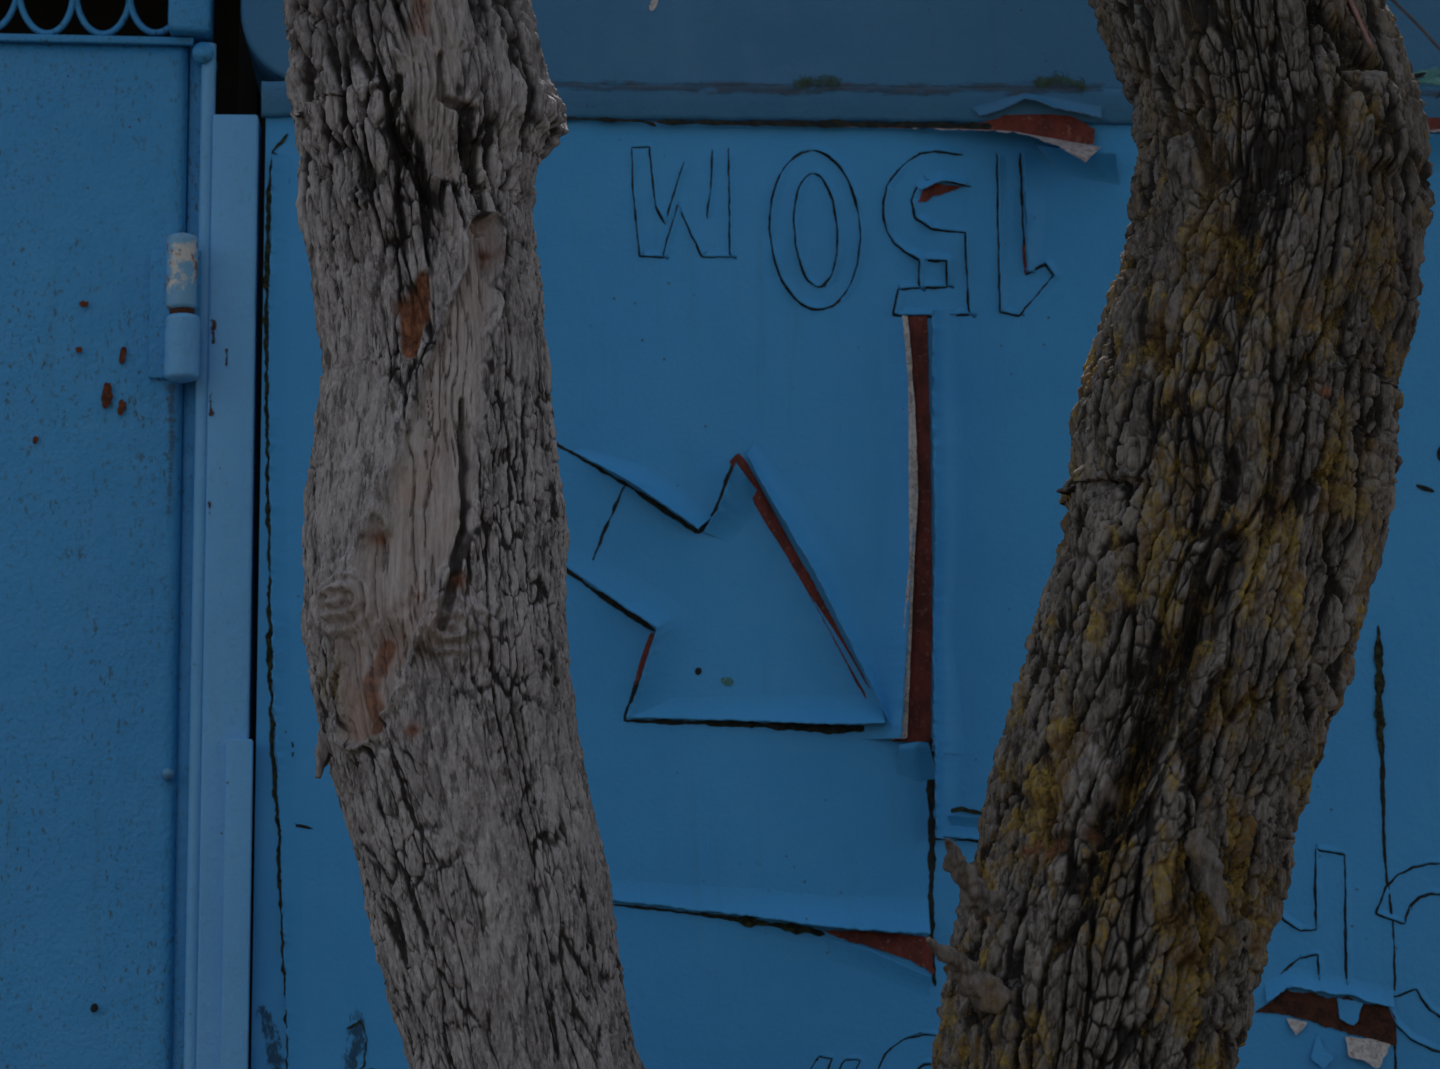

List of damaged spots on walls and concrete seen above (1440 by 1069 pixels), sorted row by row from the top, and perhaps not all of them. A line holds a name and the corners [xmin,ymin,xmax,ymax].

rust [101,383,126,416]
peeling [1256,967,1397,1068]